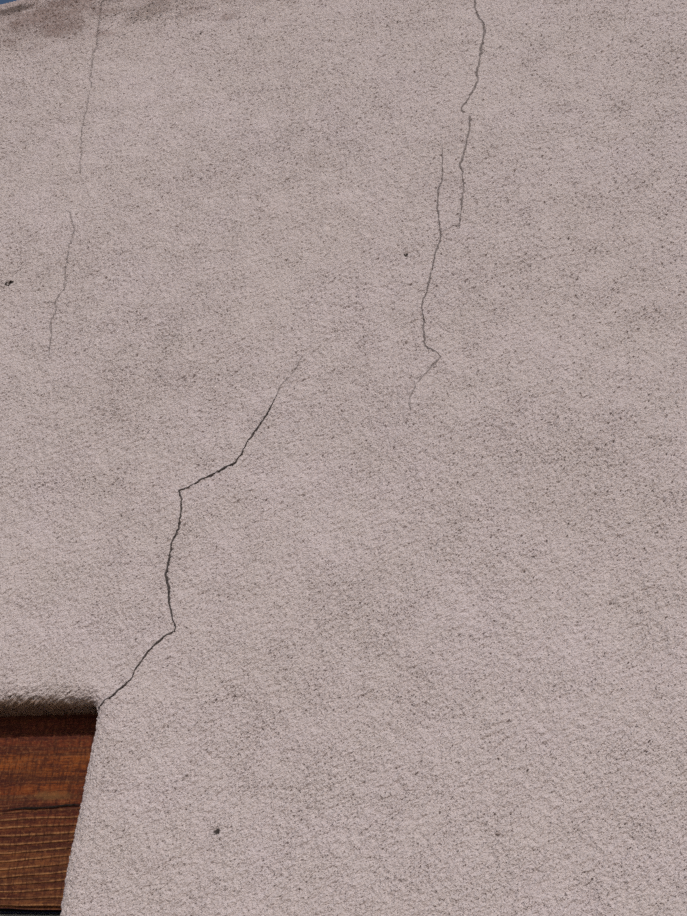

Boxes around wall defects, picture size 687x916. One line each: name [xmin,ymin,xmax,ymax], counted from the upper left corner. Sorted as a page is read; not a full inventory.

crack [98,395,277,709]